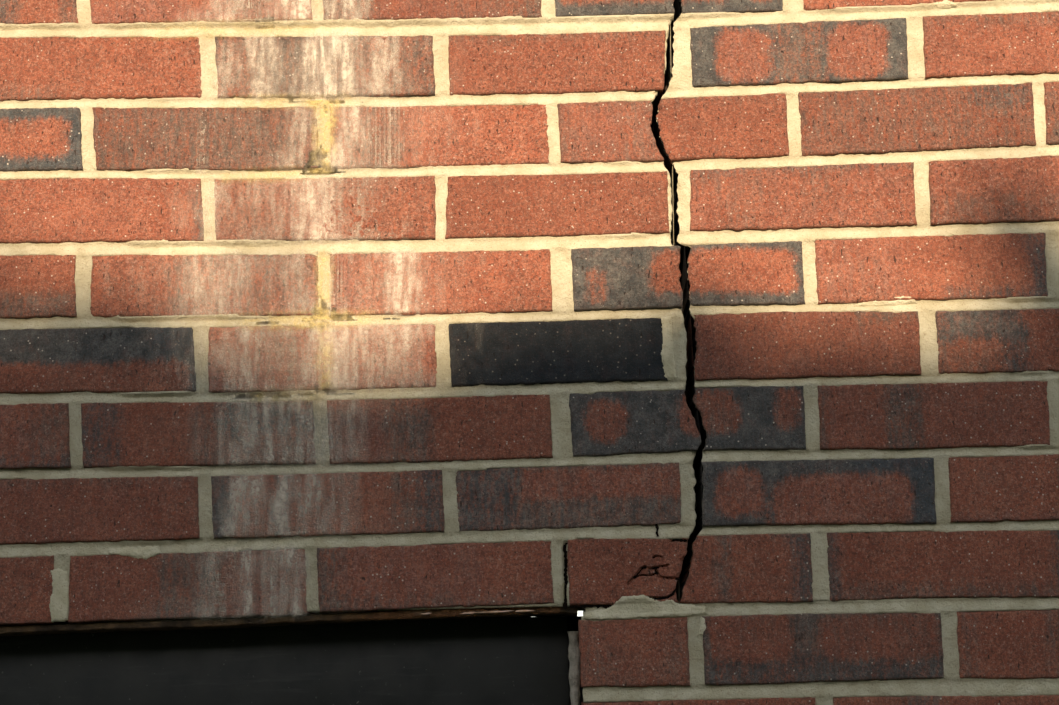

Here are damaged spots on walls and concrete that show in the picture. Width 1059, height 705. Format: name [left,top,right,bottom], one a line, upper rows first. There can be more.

crack [633,0,707,600]